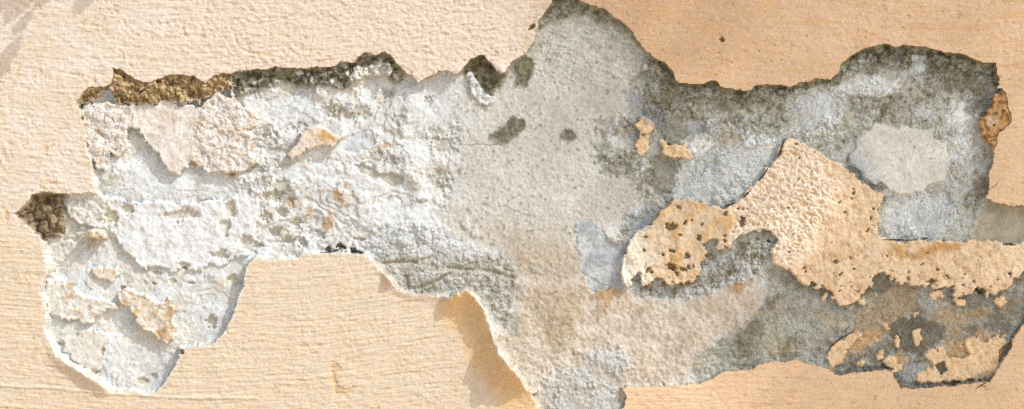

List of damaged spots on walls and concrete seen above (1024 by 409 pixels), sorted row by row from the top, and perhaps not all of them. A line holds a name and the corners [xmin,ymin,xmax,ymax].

flaking render [14,51,522,396]
leakage [675,144,771,203]
spalling [422,0,1024,409]
leakage [792,91,840,128]